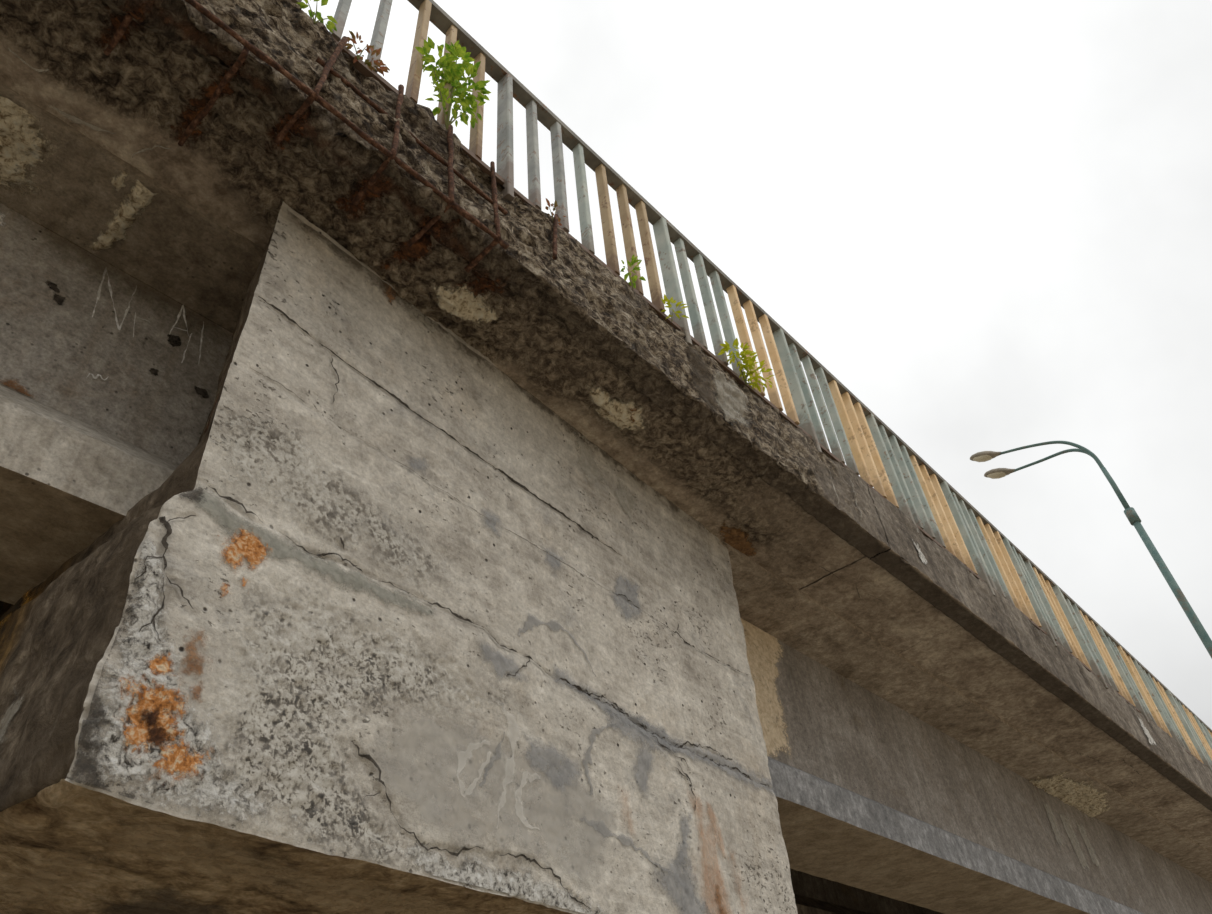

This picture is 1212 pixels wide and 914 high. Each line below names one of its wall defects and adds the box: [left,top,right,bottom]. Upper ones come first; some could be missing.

spalling [0,96,51,192]
spalling [46,281,65,305]
corrosion [380,216,460,270]
crack [134,515,196,642]
corrosion [218,529,272,596]
crack [209,486,769,809]
corrosion [120,631,211,780]
crack [352,741,590,909]
corrosion [696,801,729,914]